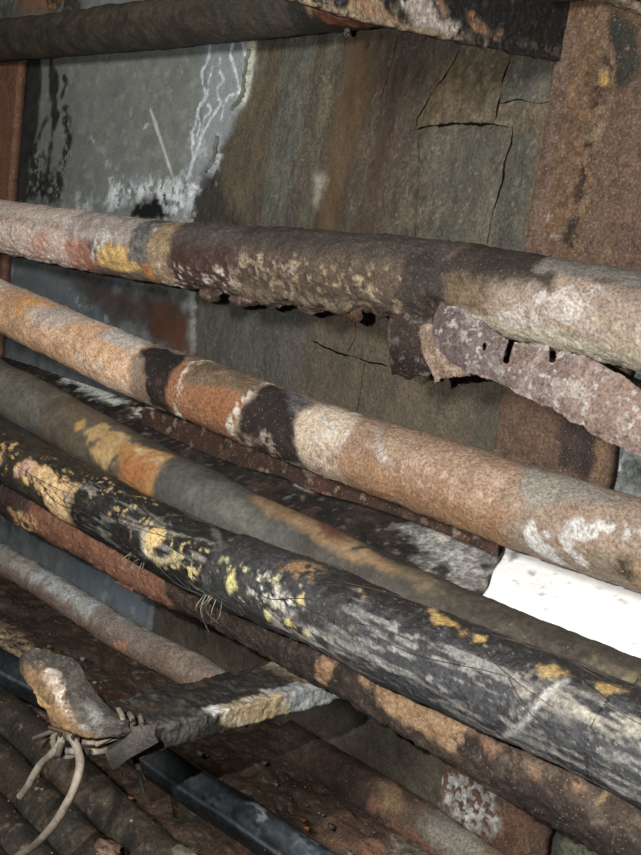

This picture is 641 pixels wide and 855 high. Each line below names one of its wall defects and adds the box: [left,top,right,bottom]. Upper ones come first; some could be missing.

water stain [104,41,256,219]
crack [415,45,549,242]
crack [311,323,389,409]